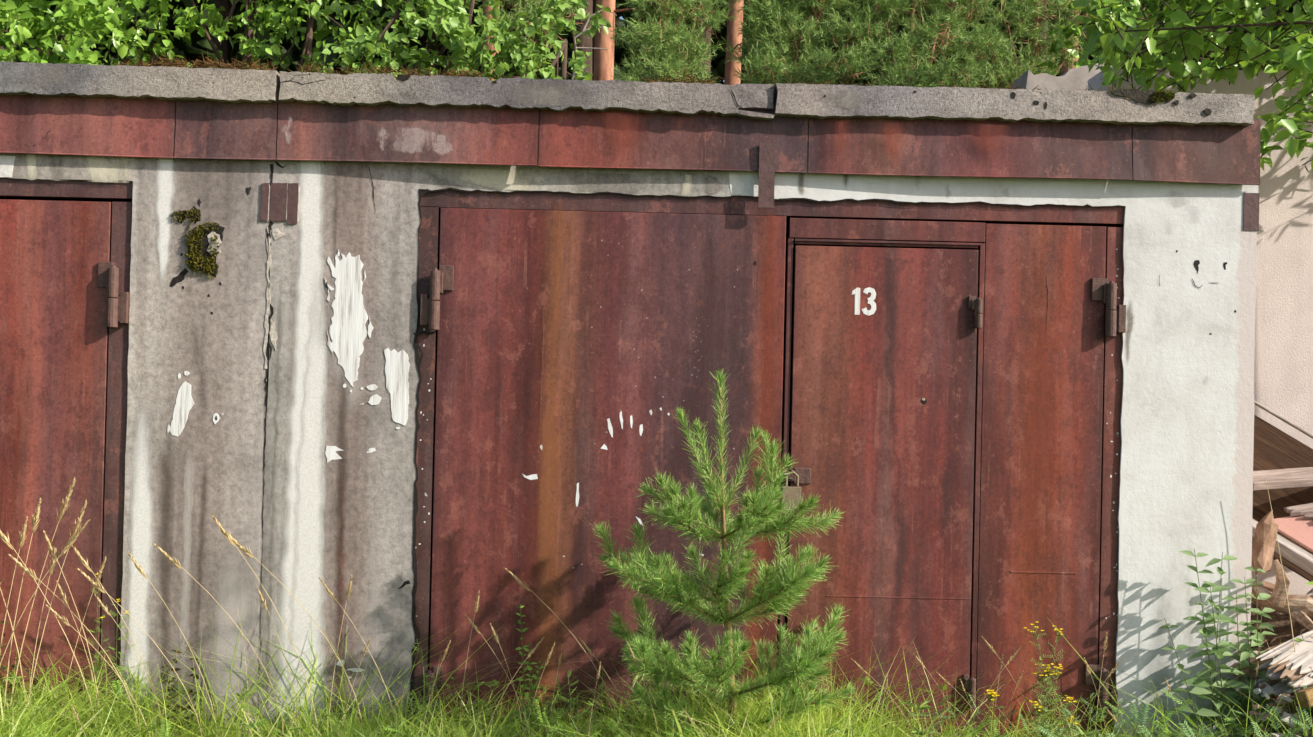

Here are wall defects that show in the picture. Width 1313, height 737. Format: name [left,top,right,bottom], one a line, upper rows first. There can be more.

damp [126,417,205,712]
peeling [167,371,194,436]
damp [211,578,249,735]
crack [257,161,287,733]
damp [266,161,345,734]
peeling [324,250,410,429]